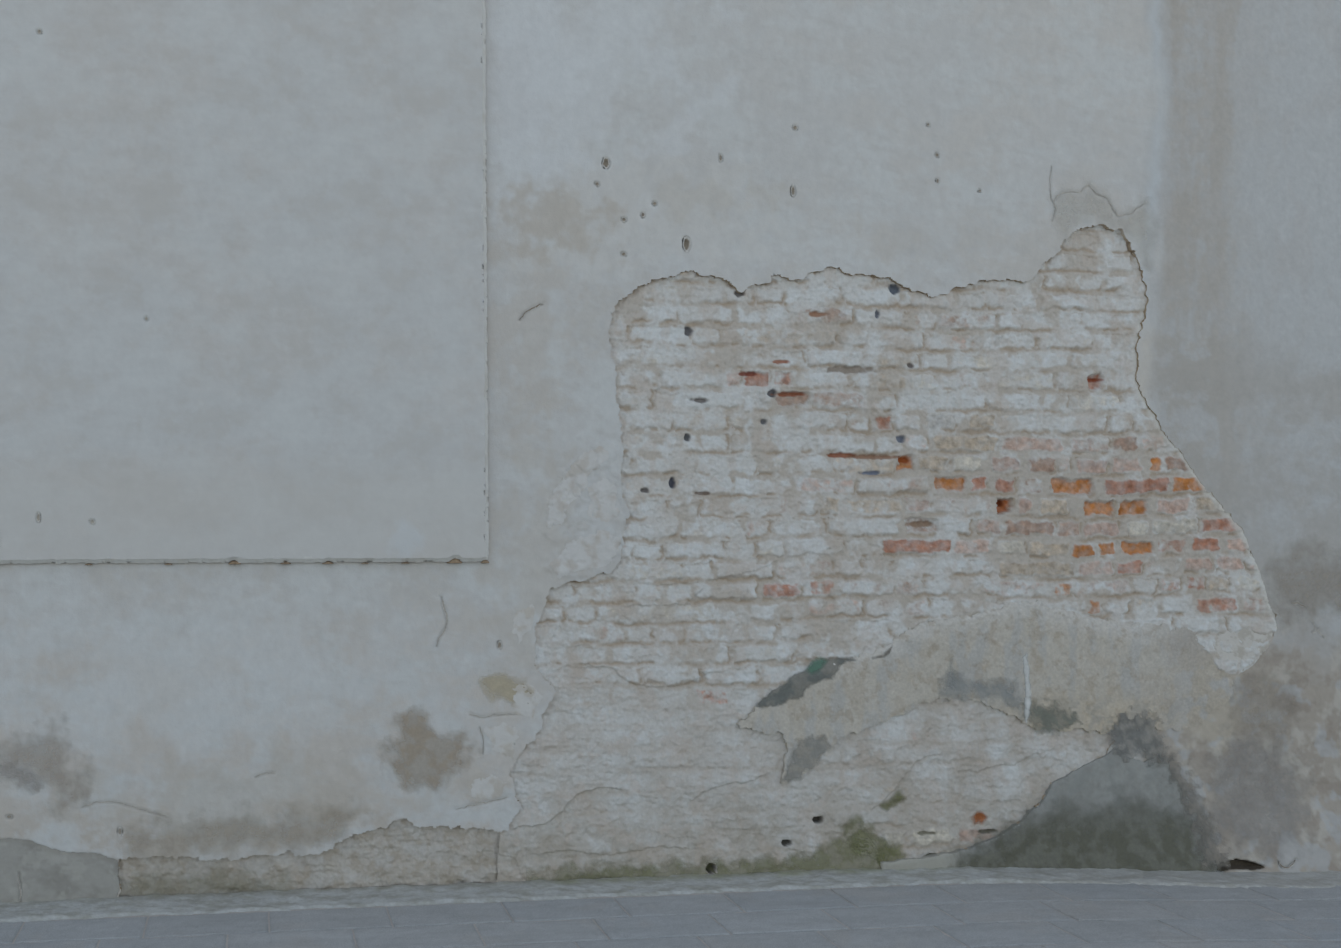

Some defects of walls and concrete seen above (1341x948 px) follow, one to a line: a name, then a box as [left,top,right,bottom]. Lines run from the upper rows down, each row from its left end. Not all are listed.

crack [1050,166,1146,222]
spalling [118,224,1277,897]
damp [394,712,461,788]
damp [959,756,1229,872]